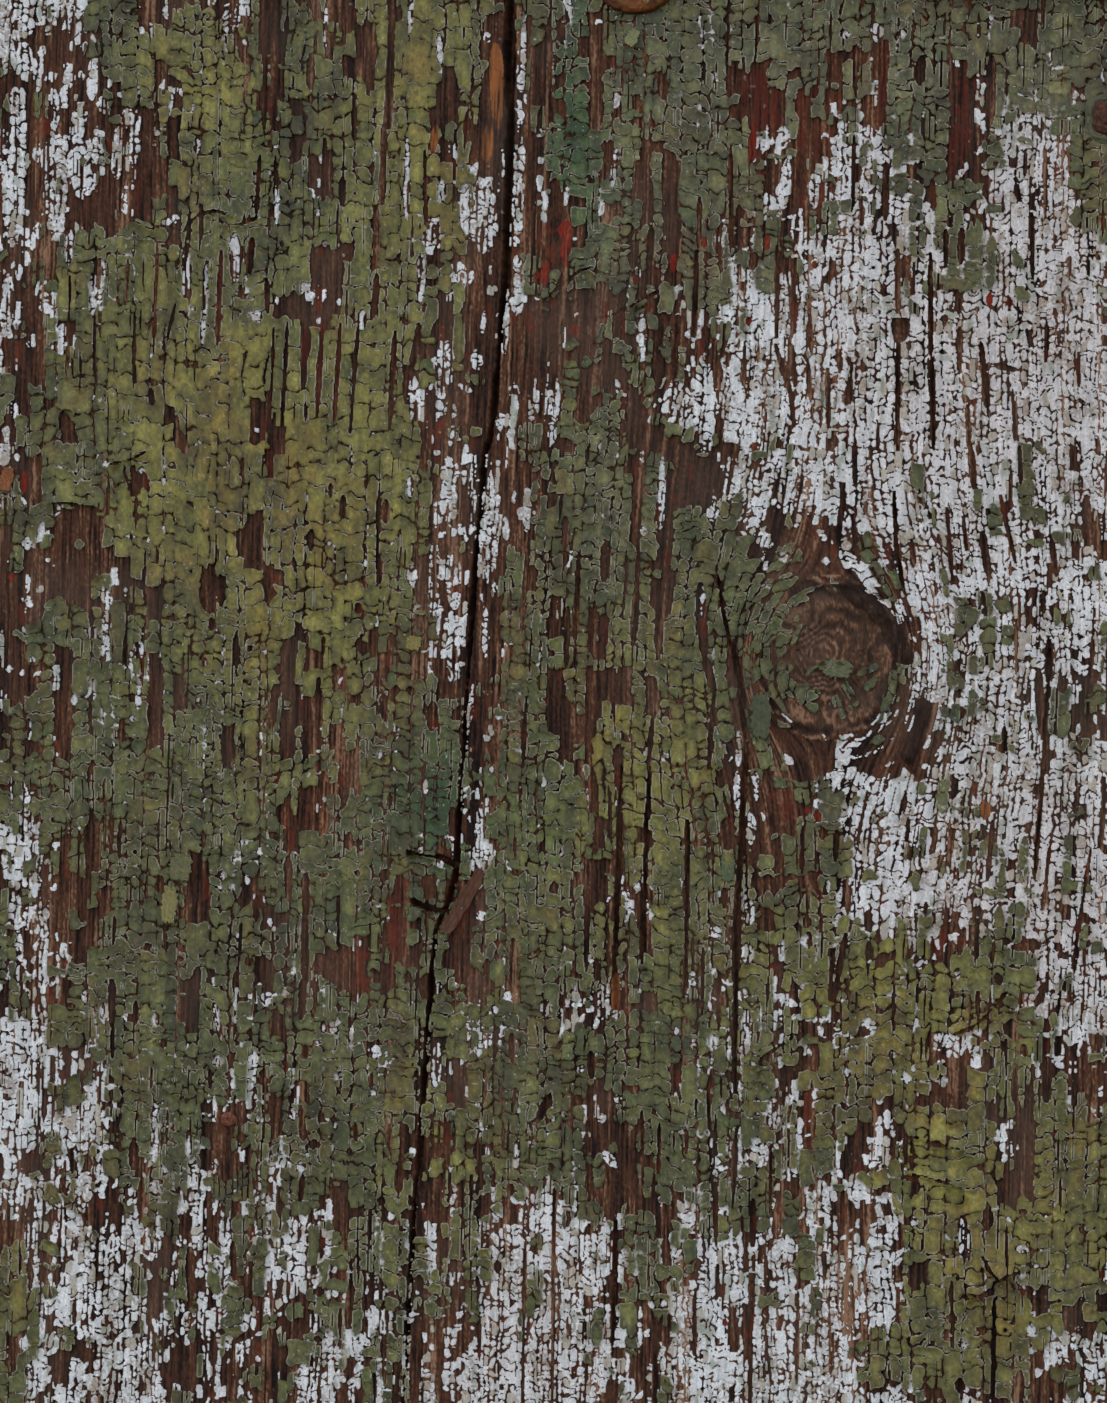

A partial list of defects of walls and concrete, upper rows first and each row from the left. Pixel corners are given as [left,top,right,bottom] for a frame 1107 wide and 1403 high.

peeling [0,0,184,495]
peeling [316,242,356,319]
peeling [53,655,77,763]
peeling [33,494,120,612]
peeling [272,626,422,1030]
crack [402,0,597,1403]
peeling [405,0,1107,1078]
peeling [0,792,402,1403]
peeling [420,1092,929,1403]
peeling [945,1046,981,1111]
peeling [995,1145,1055,1199]
peeling [1045,1164,1107,1403]